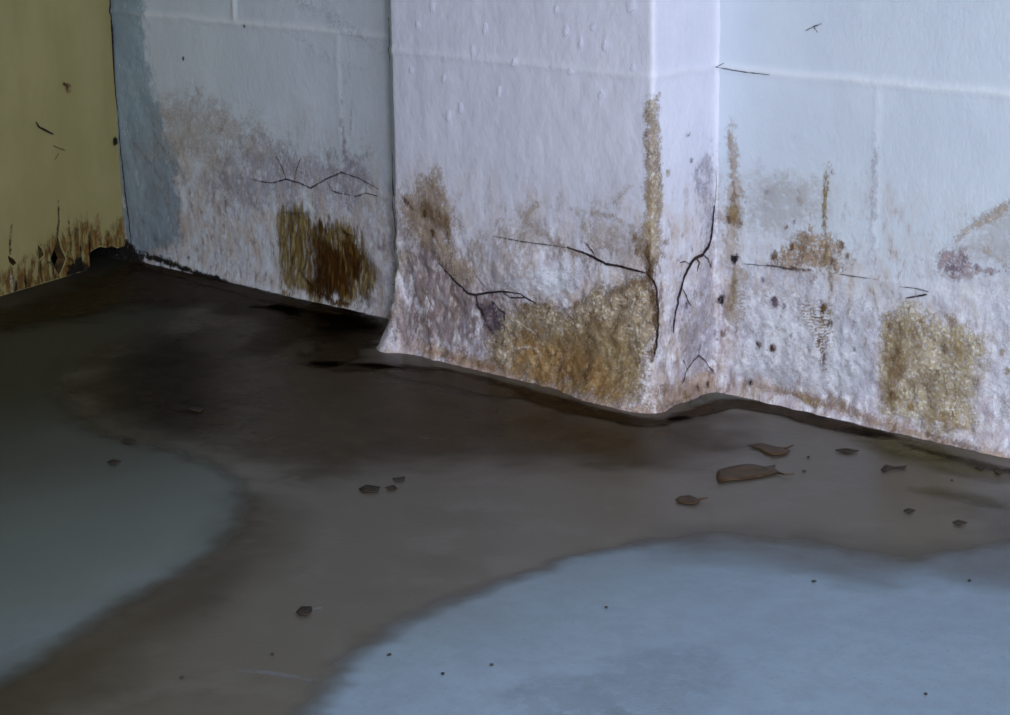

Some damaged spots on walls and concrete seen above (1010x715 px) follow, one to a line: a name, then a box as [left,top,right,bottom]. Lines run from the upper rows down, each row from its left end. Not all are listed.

crack [249,133,396,250]
leakage [14,0,758,426]
crack [438,263,536,316]
crack [494,179,717,357]
leakage [938,202,1010,279]
leakage [0,278,1010,715]